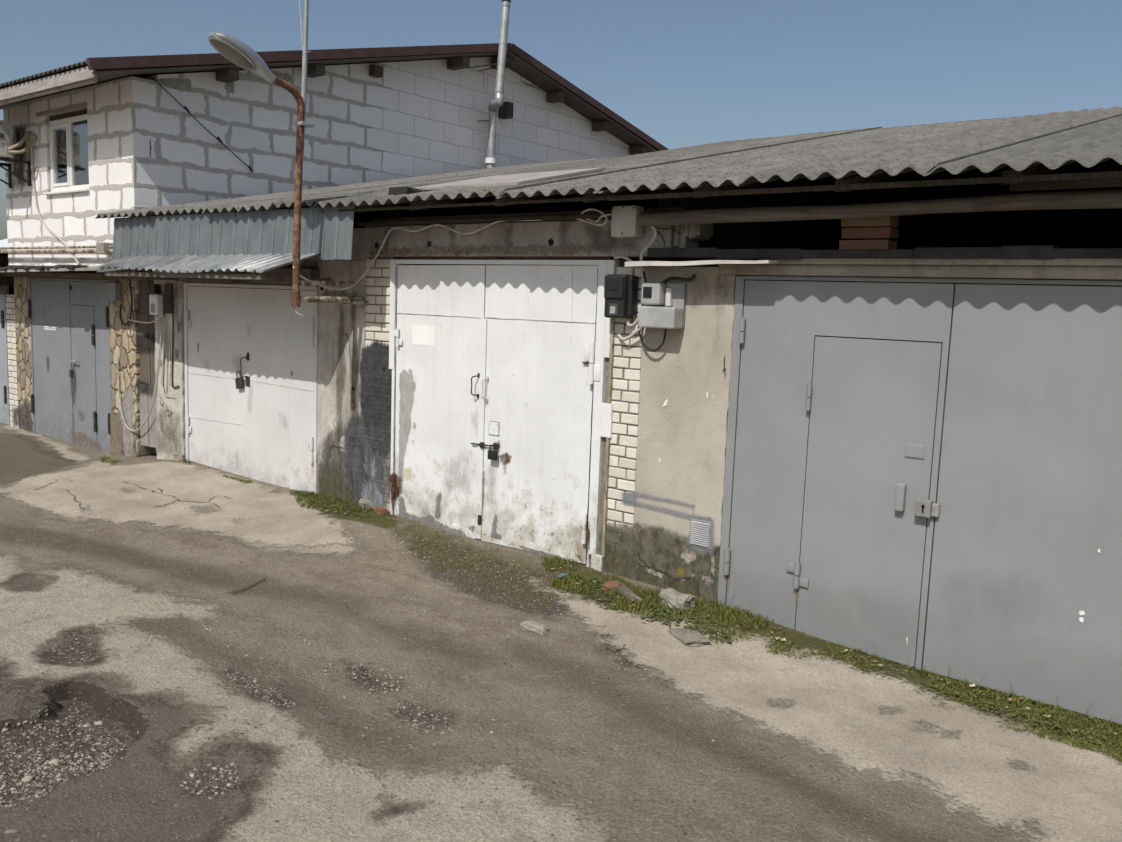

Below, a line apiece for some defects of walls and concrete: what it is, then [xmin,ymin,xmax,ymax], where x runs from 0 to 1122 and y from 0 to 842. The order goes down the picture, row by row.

leakage [318,291,361,448]
peeling [398,369,415,481]
corrosion [388,475,401,509]
peeling [398,471,562,559]